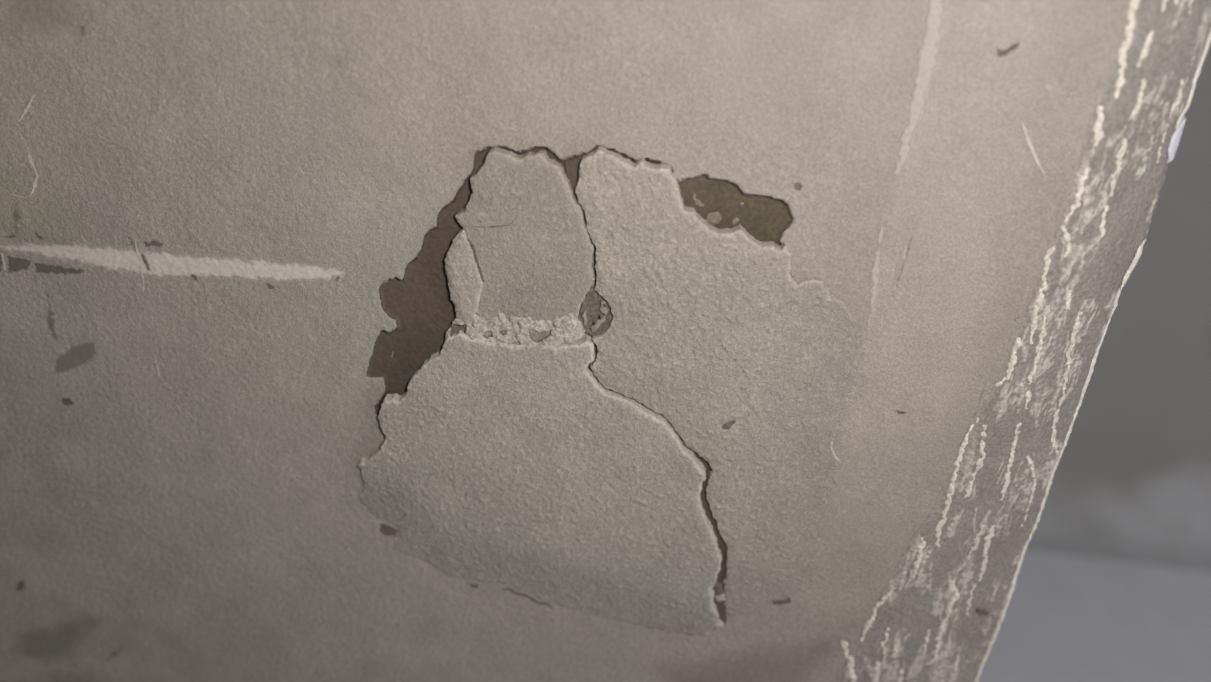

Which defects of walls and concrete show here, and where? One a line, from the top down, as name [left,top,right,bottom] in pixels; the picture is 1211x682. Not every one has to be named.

crack [564,160,597,283]
peeling [358,146,865,636]
crack [641,403,728,623]
spalling [836,0,1211,682]